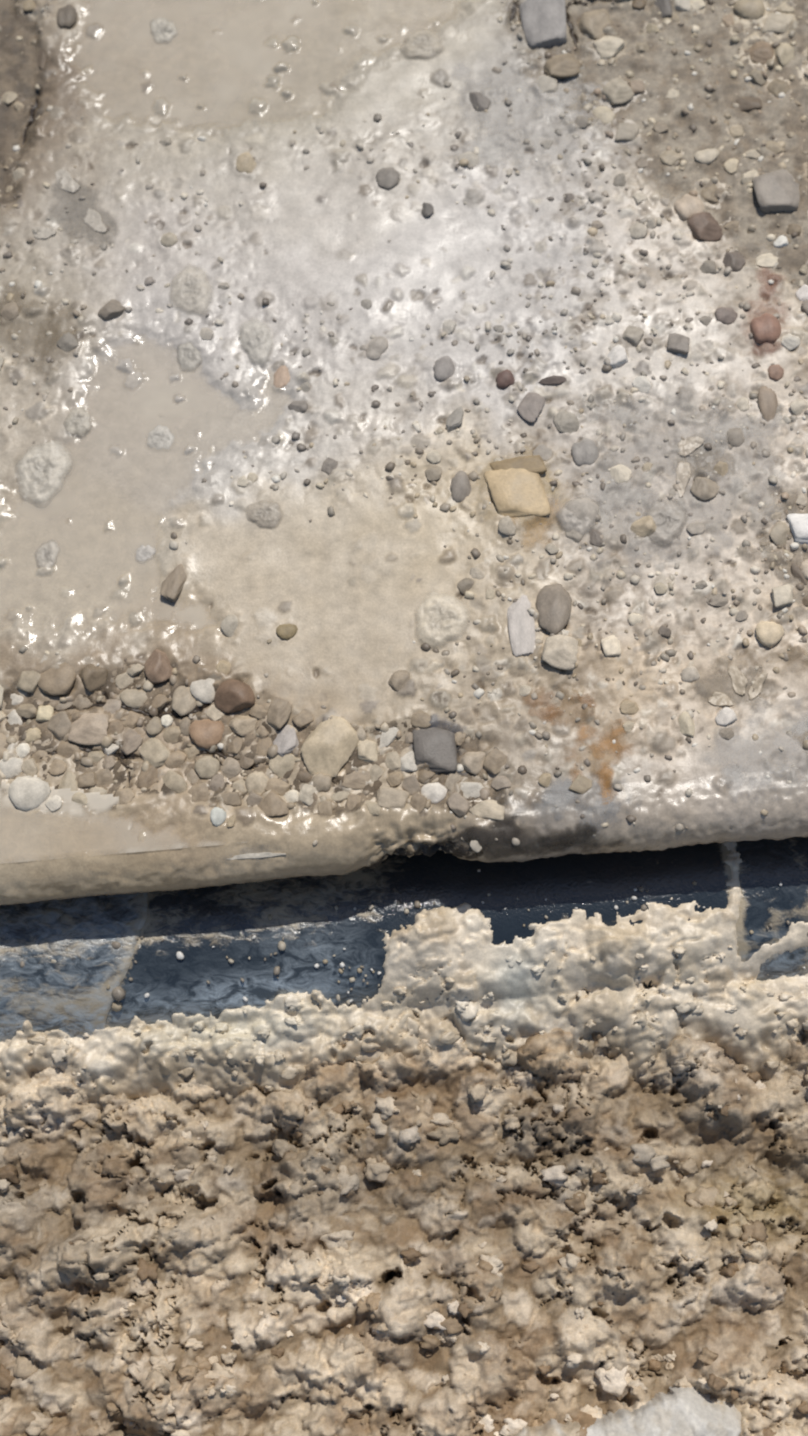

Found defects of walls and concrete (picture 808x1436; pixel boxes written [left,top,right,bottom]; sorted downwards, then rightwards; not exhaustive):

rust [525,692,625,801]
peeling [226,851,286,860]
spalling [361,841,483,869]